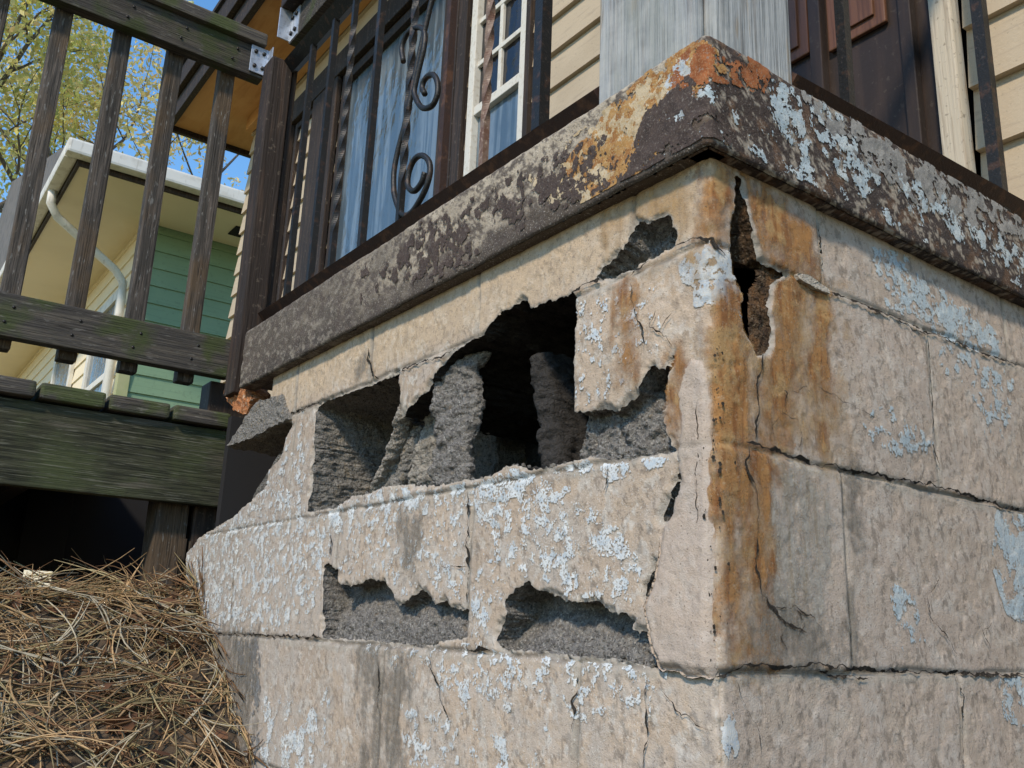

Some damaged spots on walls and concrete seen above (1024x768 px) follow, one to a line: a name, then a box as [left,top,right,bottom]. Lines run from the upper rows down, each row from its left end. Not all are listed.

peeling [360,57,740,295]
corrosion [565,40,771,199]
water stain [397,514,422,567]
spalling [186,286,678,768]
corrosion [701,163,833,670]
crack [716,292,1024,763]
water stain [354,643,411,768]